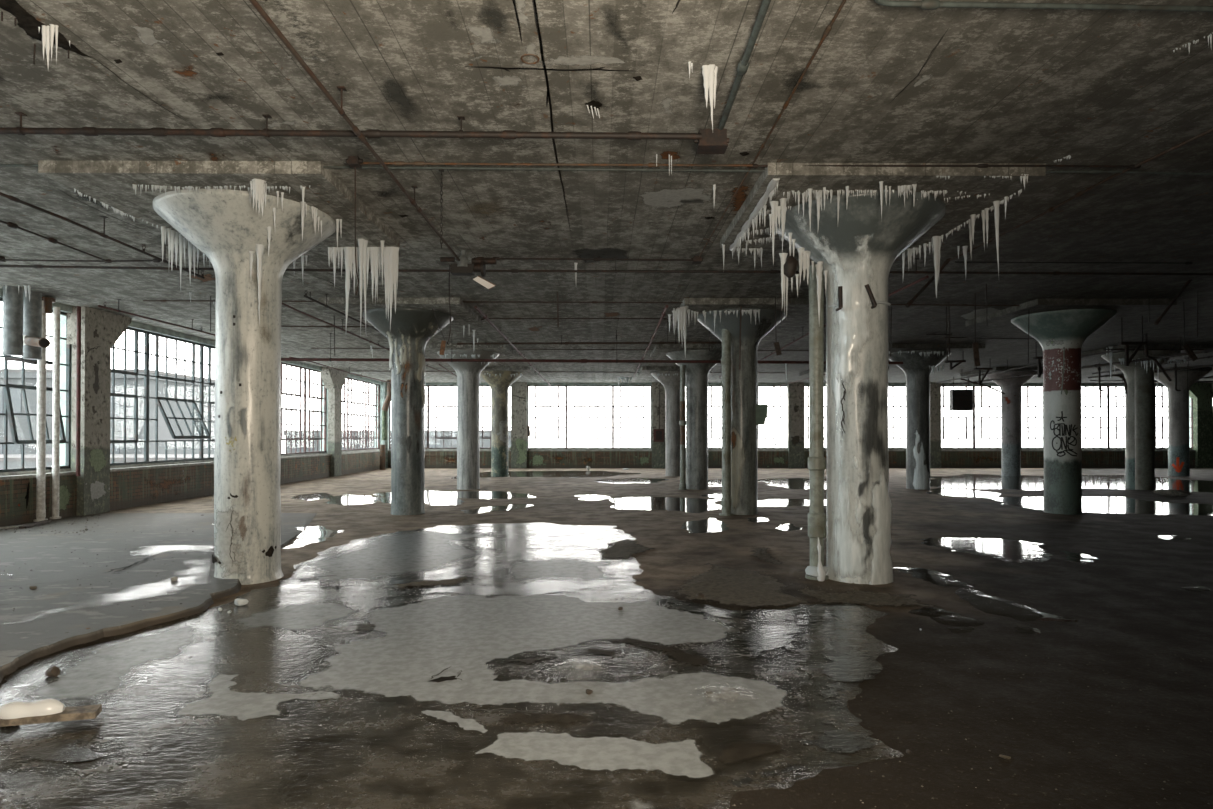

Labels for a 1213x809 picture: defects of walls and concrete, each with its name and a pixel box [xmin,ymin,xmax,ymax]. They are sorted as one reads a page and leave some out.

spalling [0,0,91,65]